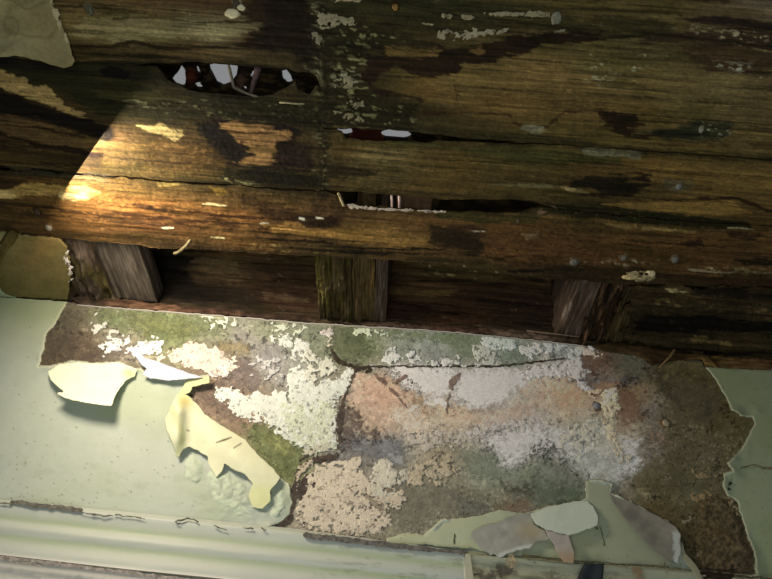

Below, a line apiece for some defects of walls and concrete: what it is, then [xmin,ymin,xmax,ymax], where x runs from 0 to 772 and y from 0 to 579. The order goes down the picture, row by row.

crack [175,518,226,530]
peeling [40,303,755,579]
damp [90,311,722,530]
crack [245,348,571,531]
crack [723,464,772,490]